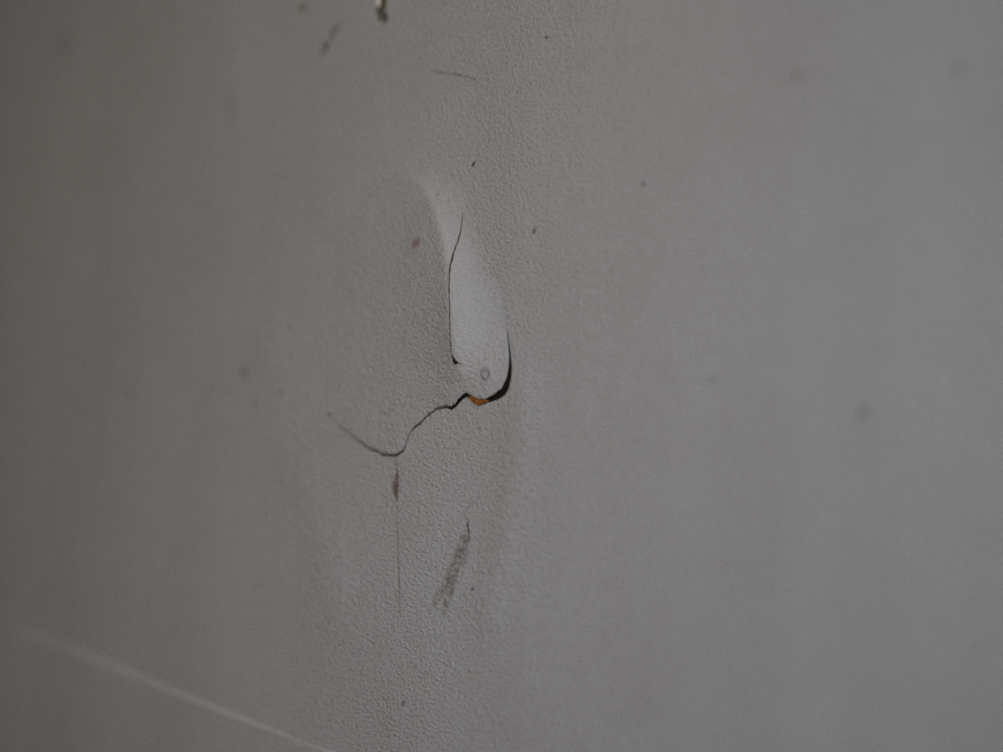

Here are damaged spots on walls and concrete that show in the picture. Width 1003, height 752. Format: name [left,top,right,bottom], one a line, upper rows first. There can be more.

crack [448,223,462,363]
crack [365,397,466,464]